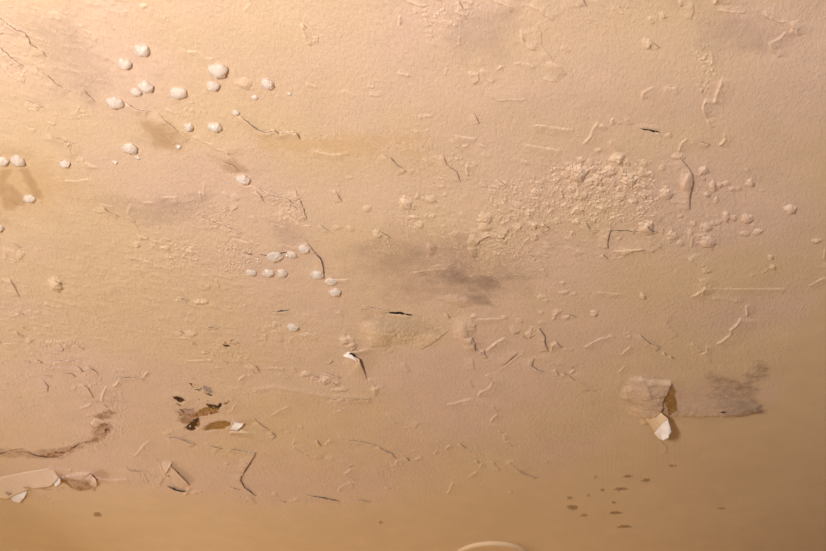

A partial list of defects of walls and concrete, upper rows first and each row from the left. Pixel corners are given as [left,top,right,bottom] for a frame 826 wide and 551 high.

spalling [162,383,283,505]